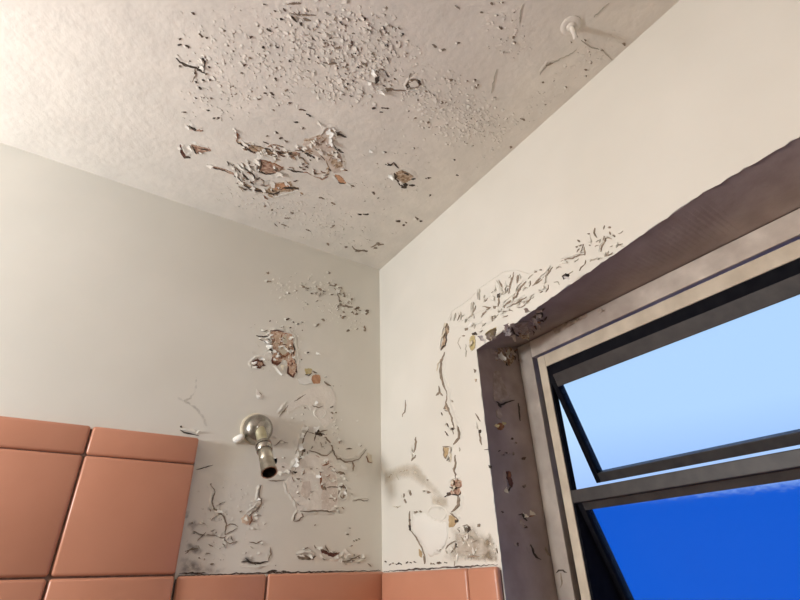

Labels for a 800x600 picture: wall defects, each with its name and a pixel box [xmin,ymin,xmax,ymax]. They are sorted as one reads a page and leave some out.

peeling [176,0,626,256]
flaking render [247,271,369,394]
peeling [438,308,547,366]
peeling [552,314,587,334]
crack [186,465,276,566]
flaking render [269,406,366,526]
crack [309,427,373,474]
crack [408,511,430,564]
crack [436,352,492,469]